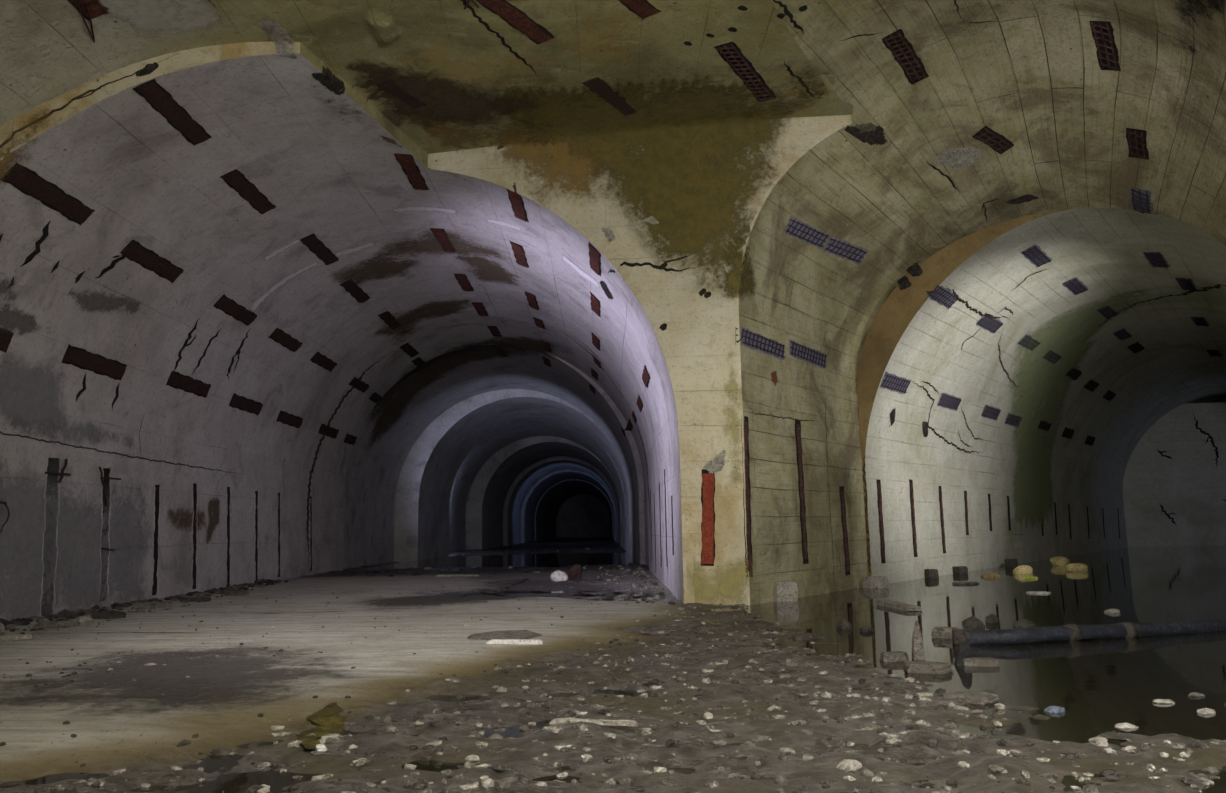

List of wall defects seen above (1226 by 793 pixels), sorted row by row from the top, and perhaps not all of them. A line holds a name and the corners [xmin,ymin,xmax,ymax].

crack [0,53,181,148]
damp [333,60,827,297]
crack [9,221,126,286]
crack [173,318,251,379]
crack [76,373,86,401]
crack [112,383,120,409]
crack [0,412,238,474]
crack [910,380,983,454]